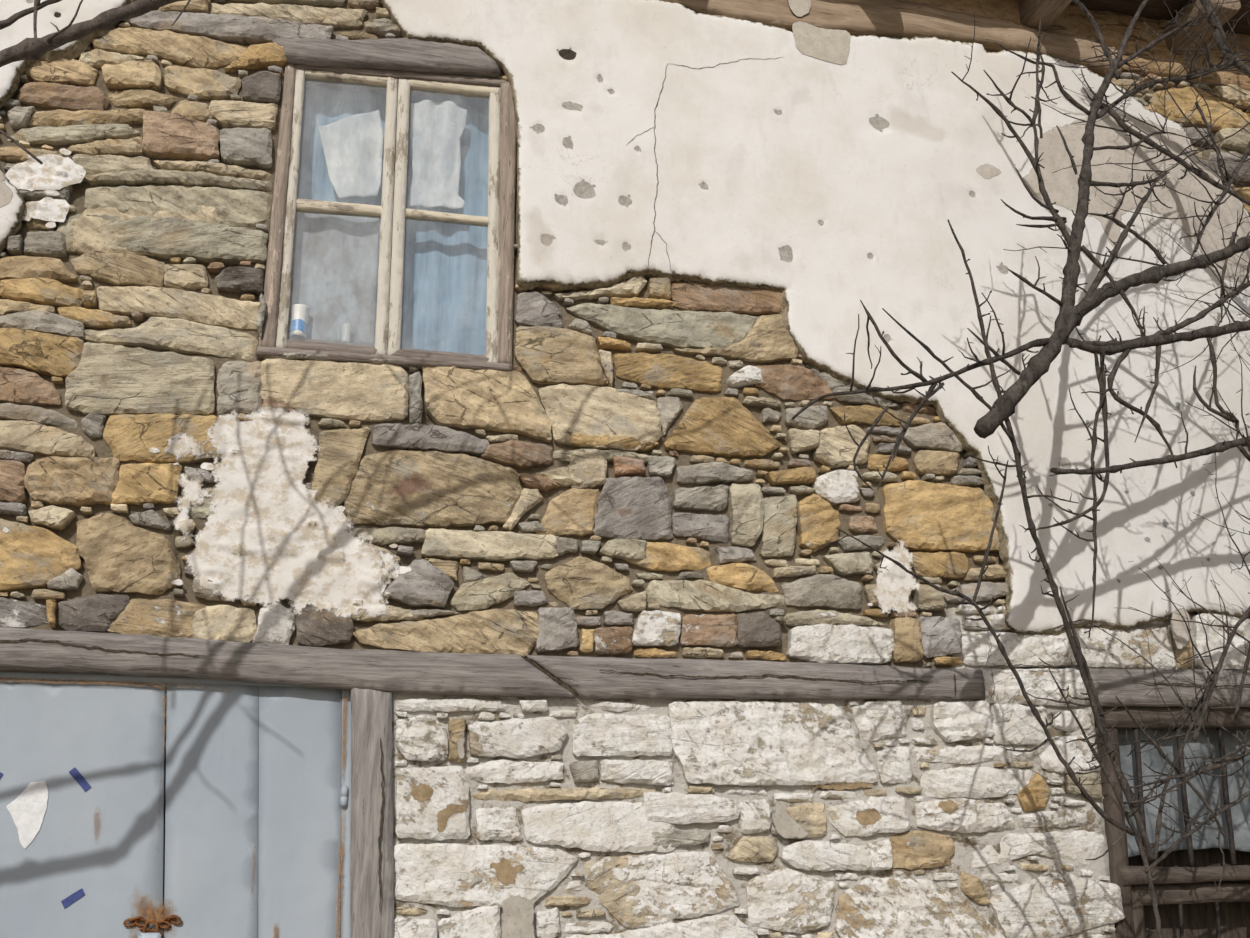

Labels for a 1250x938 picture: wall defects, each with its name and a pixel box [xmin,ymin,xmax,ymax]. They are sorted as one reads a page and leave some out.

peeling [378,0,484,51]
peeling [0,30,110,108]
flaking render [556,47,576,60]
flaking render [562,136,573,149]
flaking render [562,101,583,111]
crack [631,57,780,269]
flaking render [869,114,889,131]
peeling [0,166,31,252]
flaking render [554,179,596,206]
peeling [1023,112,1250,282]
flaking render [778,245,793,262]
peeling [517,270,1250,649]